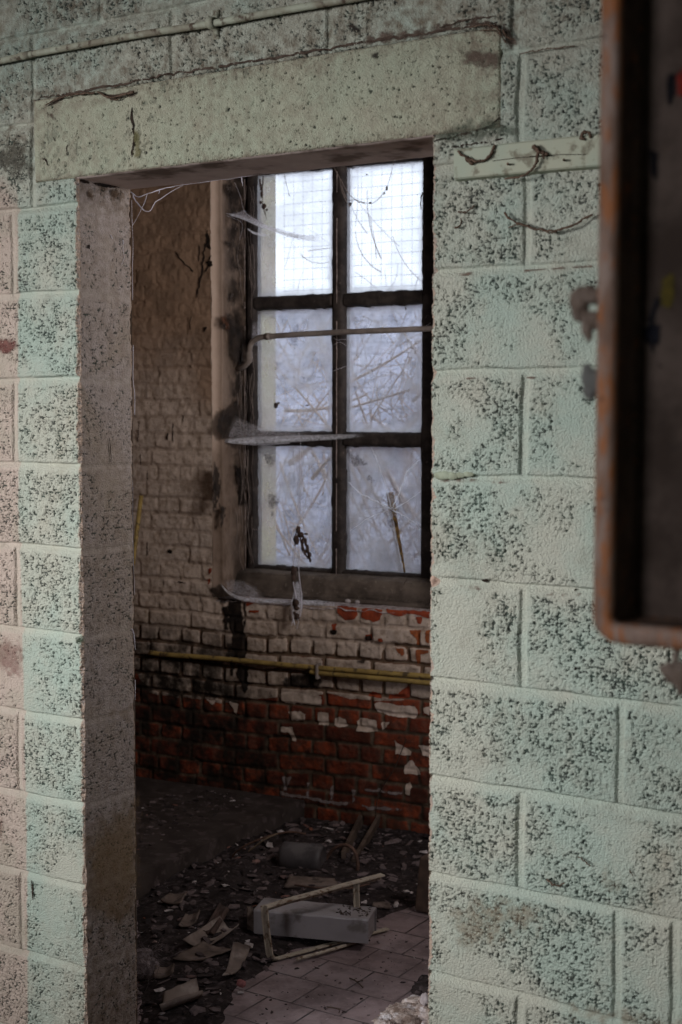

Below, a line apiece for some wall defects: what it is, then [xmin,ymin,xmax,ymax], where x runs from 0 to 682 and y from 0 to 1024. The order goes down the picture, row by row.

crack [37,16,504,157]
crack [175,230,211,330]
water stain [222,599,249,694]
peeling [332,606,430,642]
peeling [289,711,305,721]
peeling [335,717,390,732]